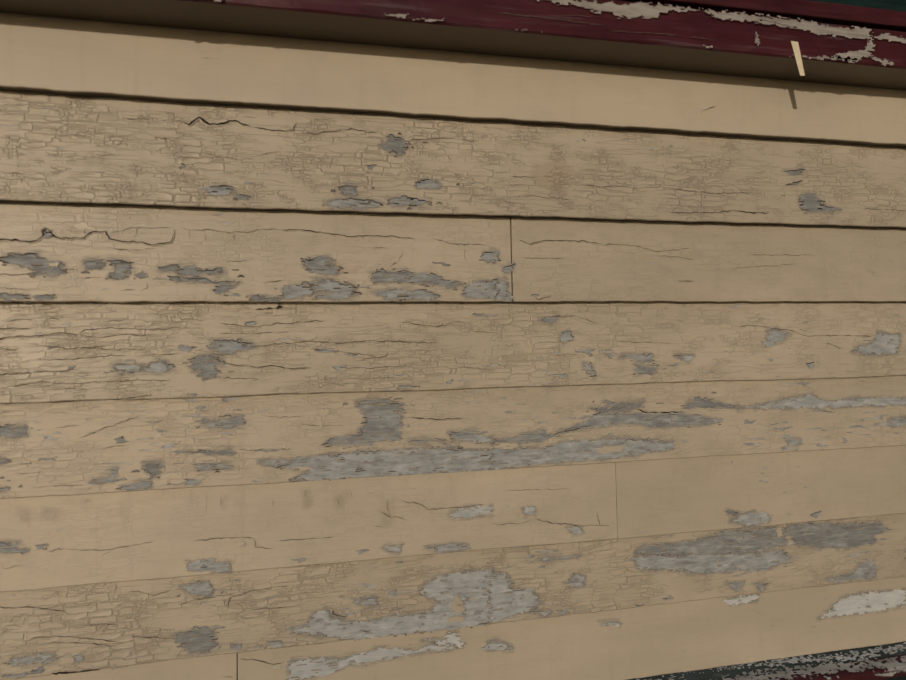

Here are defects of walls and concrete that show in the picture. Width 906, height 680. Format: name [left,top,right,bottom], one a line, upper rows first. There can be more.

peeling [535,0,906,76]
crack [123,117,376,156]
crack [588,185,768,215]
crack [0,226,414,264]
peeling [157,246,515,309]
crack [517,240,694,283]
peeling [183,384,906,486]
peeling [629,509,892,606]
crack [114,584,289,610]
peeling [259,566,569,680]
crack [50,668,100,676]
peeling [636,642,906,680]